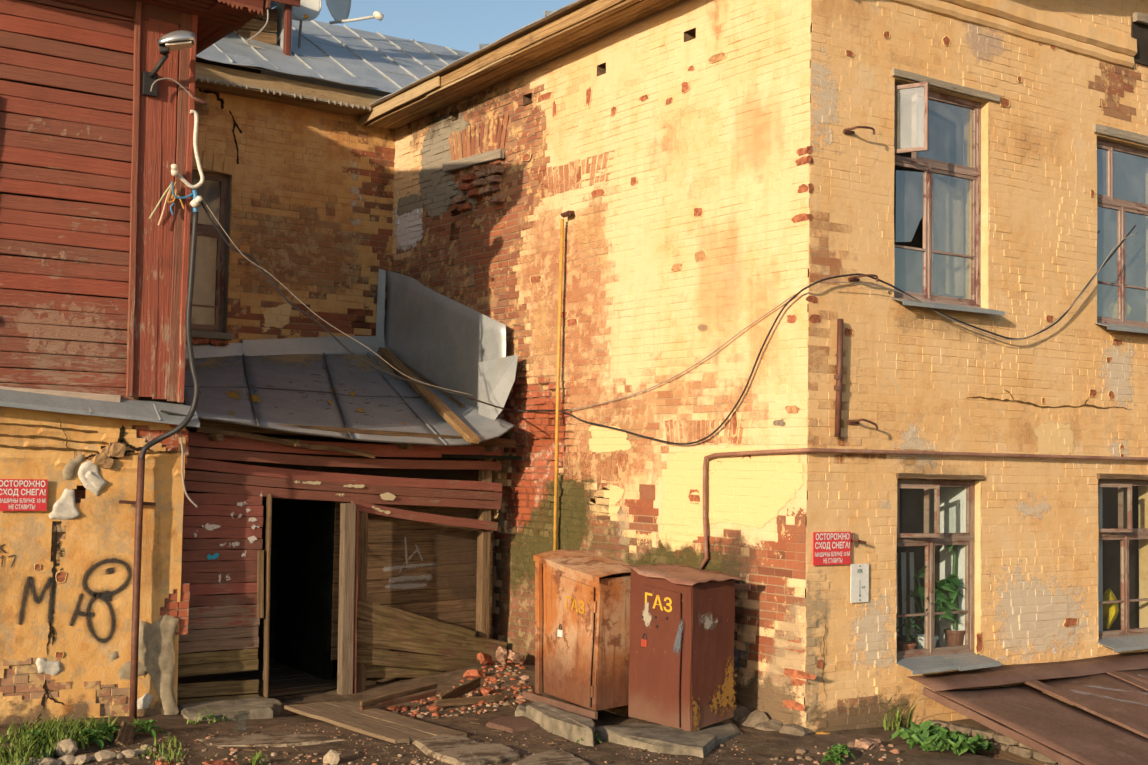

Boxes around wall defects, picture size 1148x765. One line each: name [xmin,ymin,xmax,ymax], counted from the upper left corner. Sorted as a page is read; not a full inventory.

crack [199,89,243,164]
flaking render [1088,62,1148,124]
flaking render [787,296,829,373]
flaking render [227,84,806,696]
crack [968,389,1131,410]
crack [36,522,65,722]
flaking render [160,583,190,635]
flaking render [0,652,142,717]